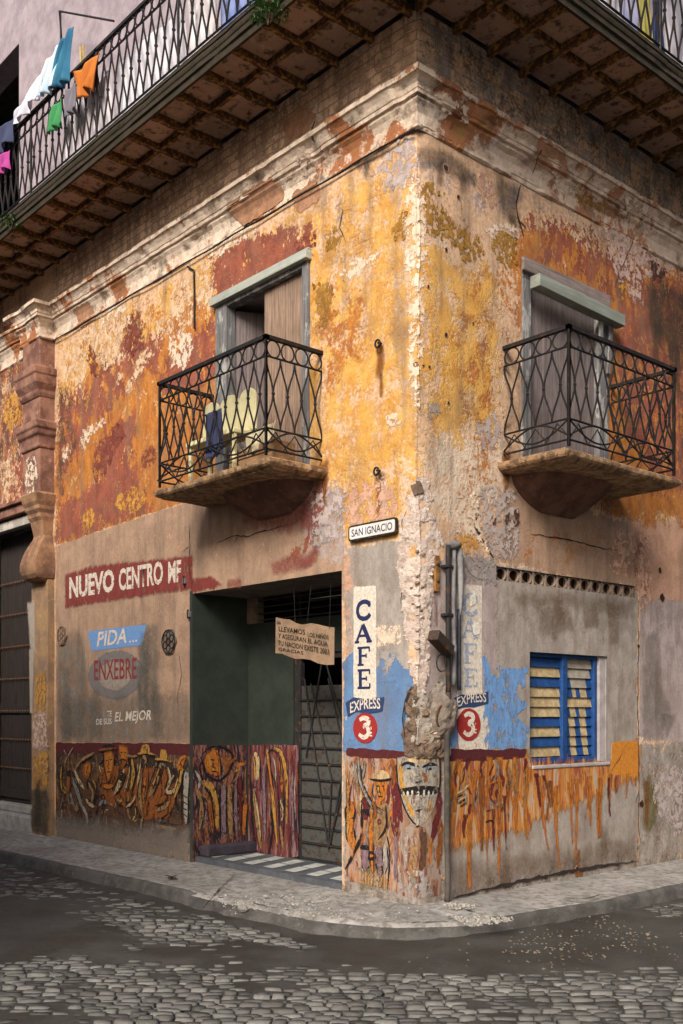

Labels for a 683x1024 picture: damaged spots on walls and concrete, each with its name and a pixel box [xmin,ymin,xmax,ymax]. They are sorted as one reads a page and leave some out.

spalling [441,95,469,124]
crack [515,134,547,237]
spalling [61,150,321,393]
peeling [62,418,127,482]
peeling [141,446,157,469]
peeling [112,487,148,514]
peeling [82,507,96,533]
crack [217,520,299,543]
crack [532,534,613,550]
spalling [310,473,521,759]